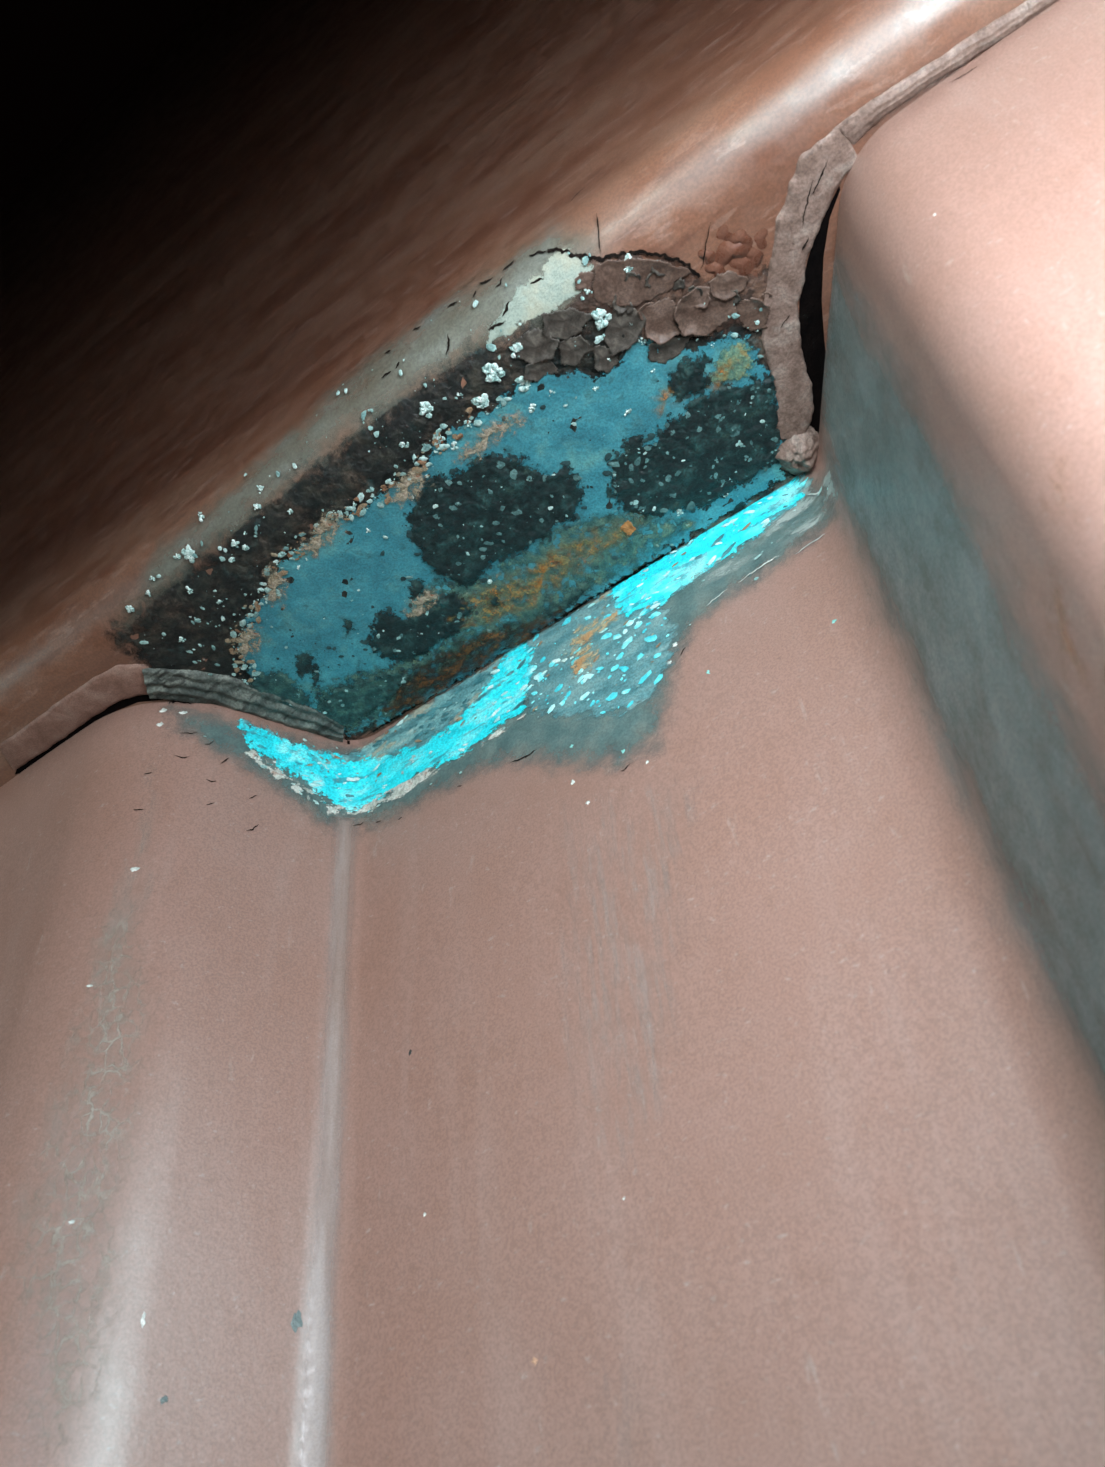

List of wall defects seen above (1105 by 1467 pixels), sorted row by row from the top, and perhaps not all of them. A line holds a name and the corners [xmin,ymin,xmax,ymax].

corrosion [390,469,425,505]
corrosion [302,513,343,558]
corrosion [262,565,288,607]
corrosion [235,627,262,654]
corrosion [382,524,624,714]
peeling [108,237,828,1467]